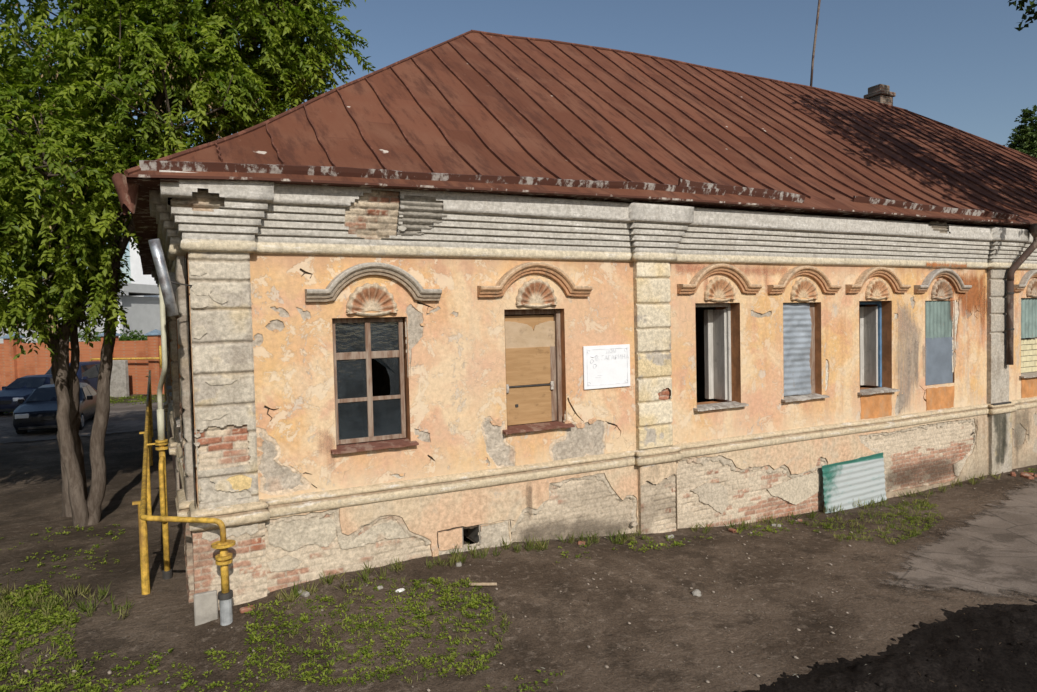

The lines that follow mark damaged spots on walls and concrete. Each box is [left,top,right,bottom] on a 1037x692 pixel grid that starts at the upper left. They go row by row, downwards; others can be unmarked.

flaking render [340,190,447,240]
flaking render [179,259,312,504]
flaking render [481,416,516,468]
flaking render [549,412,608,461]
flaking render [859,419,976,491]
flaking render [184,455,827,610]